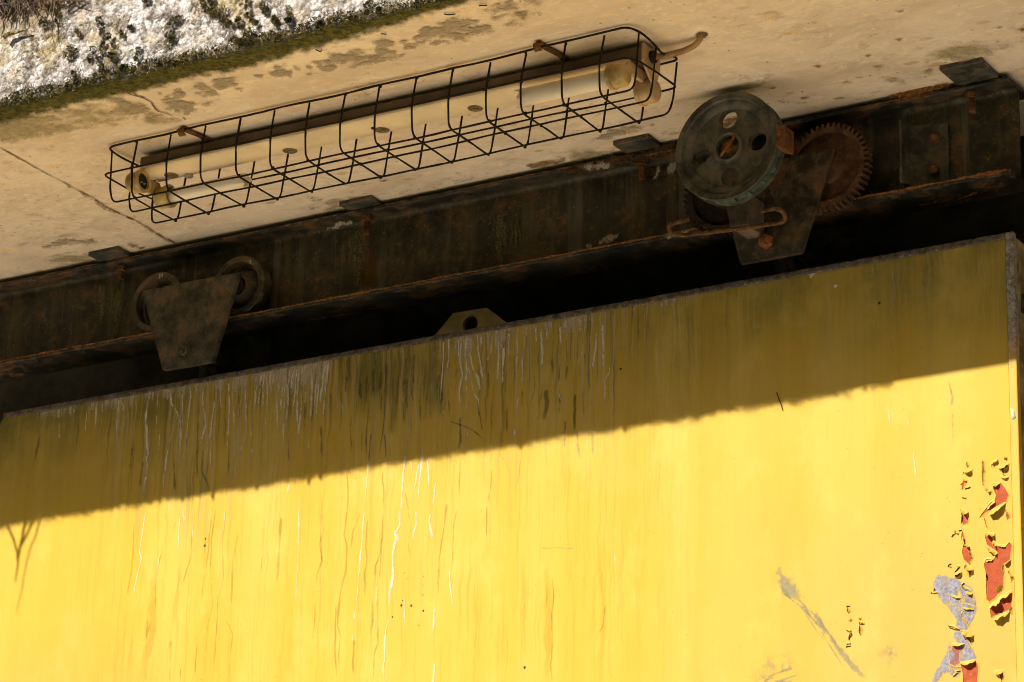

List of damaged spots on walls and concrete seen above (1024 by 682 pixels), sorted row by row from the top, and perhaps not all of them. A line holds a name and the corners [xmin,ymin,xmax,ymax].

rust [867,83,949,106]
crack [1,139,177,245]
rust [443,143,676,193]
rust [850,168,1008,200]
rust [229,228,698,318]
leakage [440,315,610,411]
leakage [42,360,332,489]
peeling [948,455,1014,682]